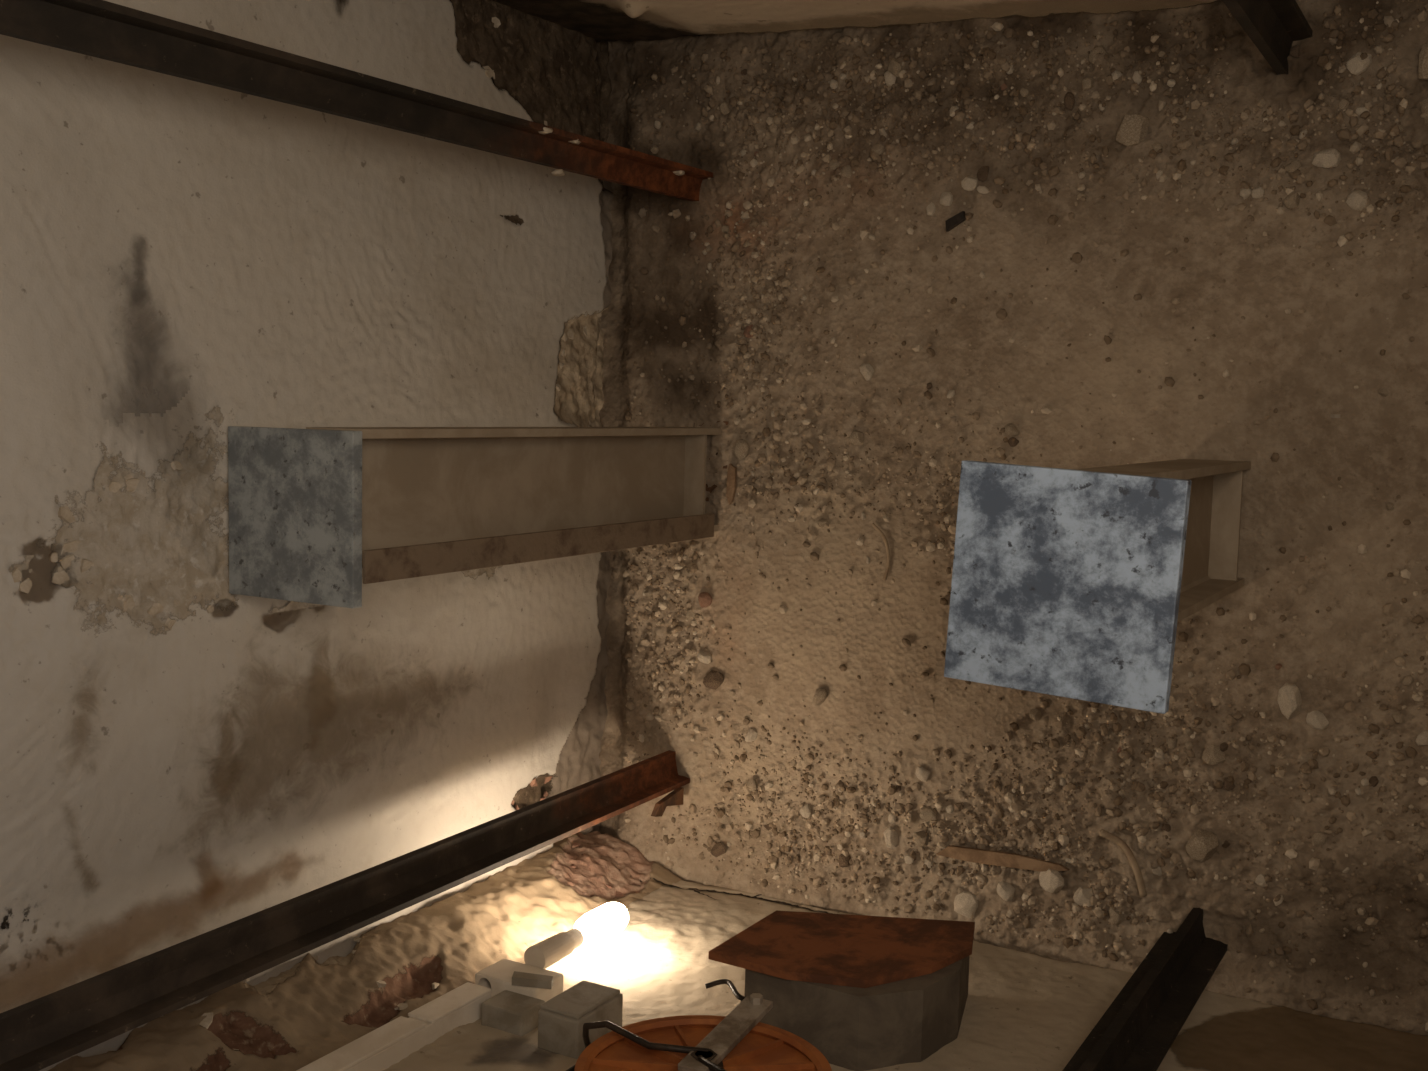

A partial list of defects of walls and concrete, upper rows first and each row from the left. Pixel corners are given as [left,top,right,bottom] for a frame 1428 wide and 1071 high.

flaking render [450,0,612,143]
water stain [123,291,178,431]
peeling [9,407,238,635]